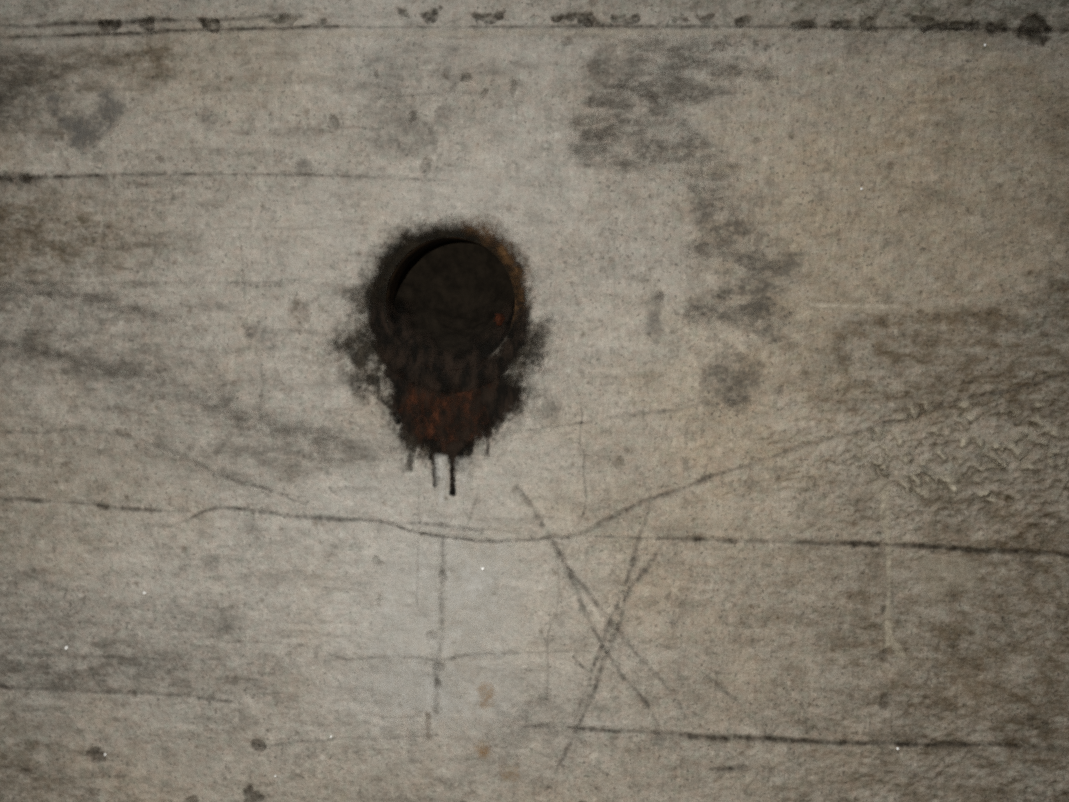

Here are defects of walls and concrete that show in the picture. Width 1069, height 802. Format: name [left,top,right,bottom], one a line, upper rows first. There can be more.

leakage [717,256,798,342]
corrosion [338,226,545,501]
crack [843,541,1069,557]
crack [689,734,968,746]